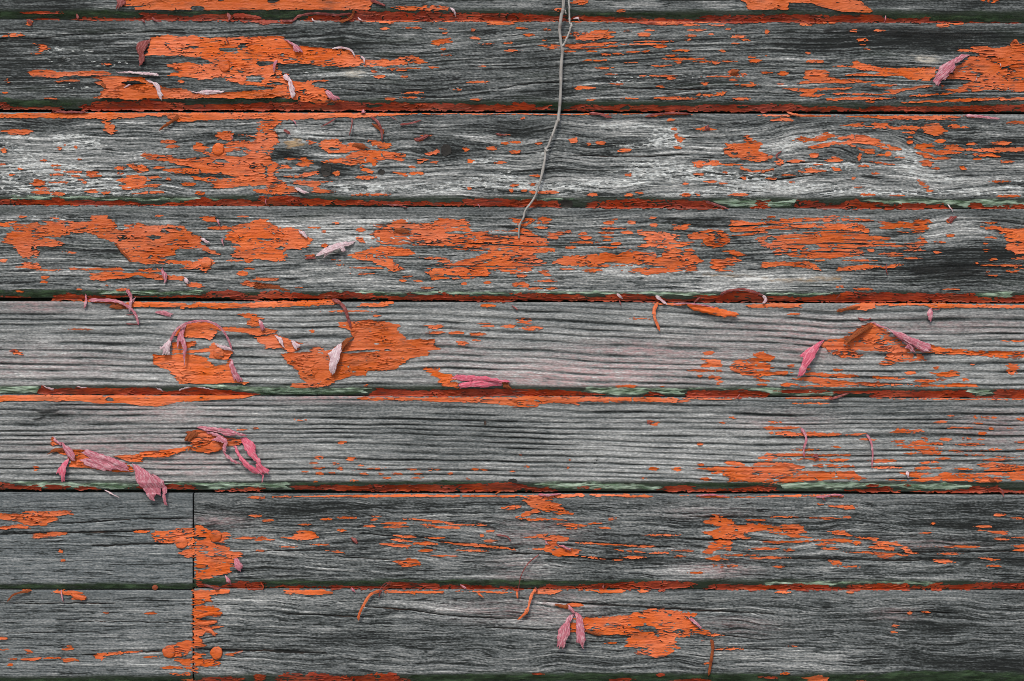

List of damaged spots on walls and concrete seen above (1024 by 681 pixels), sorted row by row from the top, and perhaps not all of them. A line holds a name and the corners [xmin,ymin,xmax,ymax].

peeling [0,0,1024,407]
peeling [0,415,1024,681]